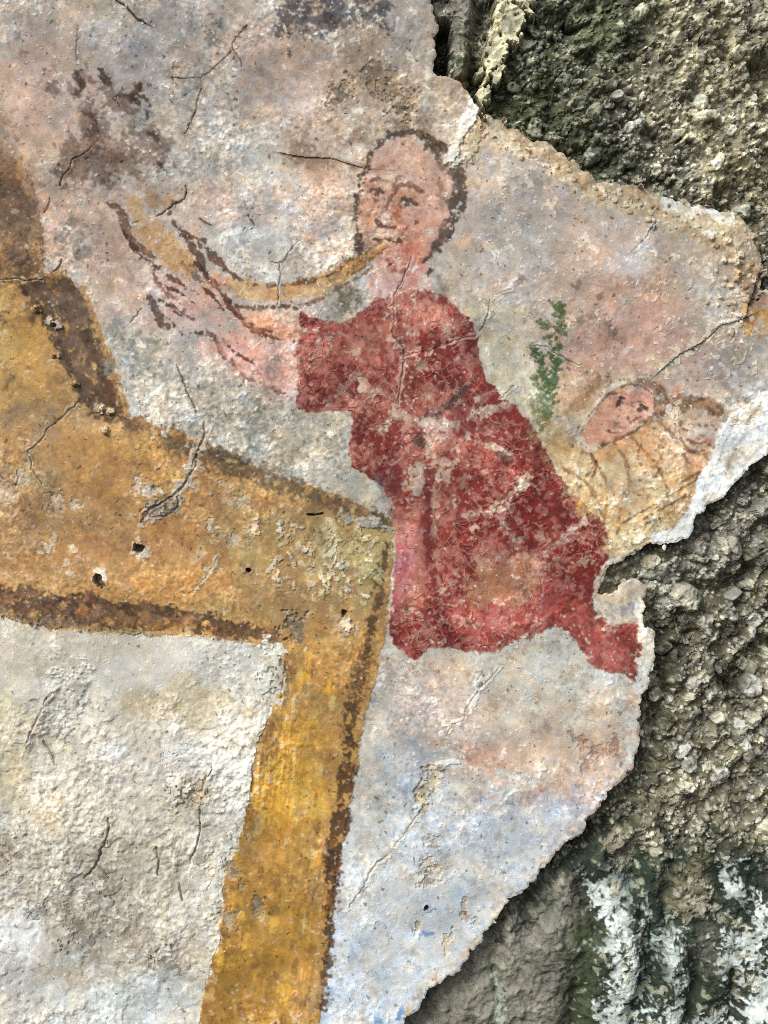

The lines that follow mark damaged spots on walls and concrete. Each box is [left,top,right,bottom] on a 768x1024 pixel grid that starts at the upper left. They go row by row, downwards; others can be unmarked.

crack [173,26,248,132]
crack [304,158,397,172]
crack [664,317,748,369]
peeling [357,377,382,398]
crack [1,403,78,486]
crack [141,365,206,523]
peeling [388,396,514,528]
peeling [462,472,534,540]
peeling [560,516,589,544]
peeling [463,547,543,613]
flaking render [568,726,624,778]
flaking render [416,834,444,889]